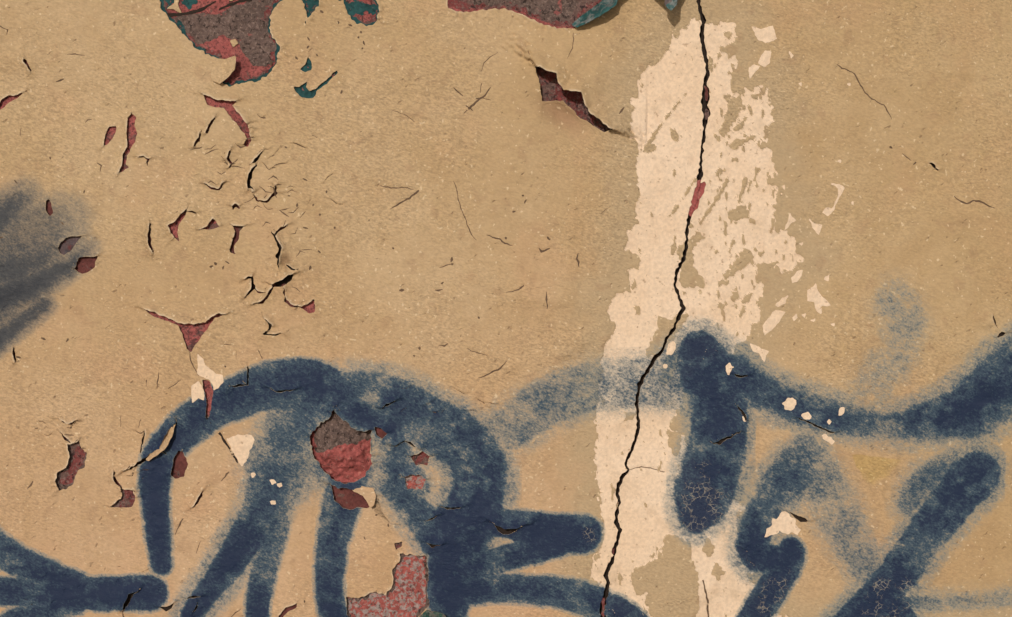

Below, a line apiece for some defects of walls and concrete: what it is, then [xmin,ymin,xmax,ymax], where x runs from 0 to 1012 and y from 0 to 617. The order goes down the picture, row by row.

peeling [339,0,379,26]
peeling [447,0,618,28]
peeling [160,0,282,147]
crack [453,52,498,113]
crack [837,64,892,119]
crack [453,181,513,246]
peeling [526,17,830,362]
crack [954,196,994,208]
crack [599,0,710,617]
crack [799,418,835,433]
peeling [590,411,673,617]
peeling [691,544,752,617]